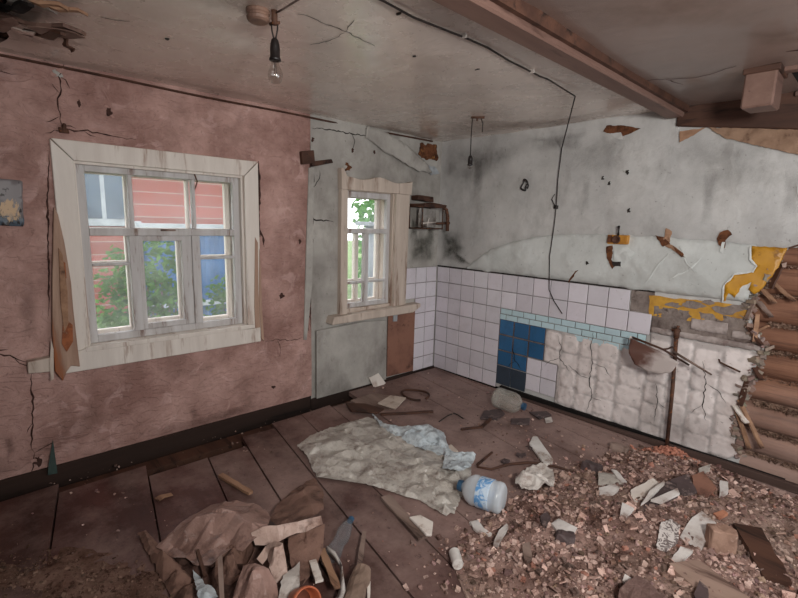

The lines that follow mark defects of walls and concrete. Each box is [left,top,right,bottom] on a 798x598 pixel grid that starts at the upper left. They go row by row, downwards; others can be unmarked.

crack [300,14,375,46]
crack [48,64,135,140]
crack [44,160,52,316]
peeling [655,235,684,257]
crack [0,349,52,473]
spalling [480,409,552,426]
crack [549,338,611,409]
peeling [543,260,787,459]
crack [693,361,726,418]